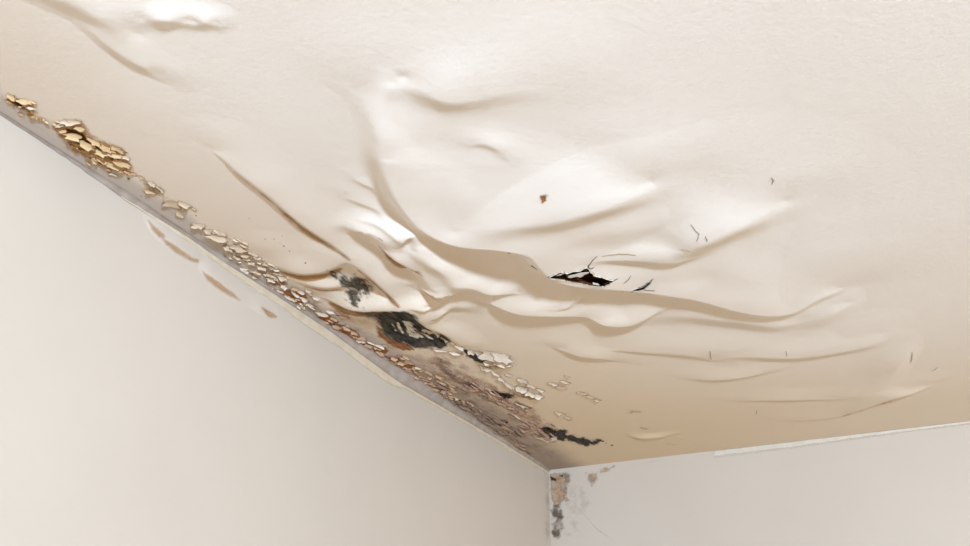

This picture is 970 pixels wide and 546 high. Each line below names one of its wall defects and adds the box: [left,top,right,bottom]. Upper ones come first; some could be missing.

peeling [5,93,602,454]
leakage [281,210,450,351]
flaking render [550,473,570,537]
leakage [540,424,613,447]